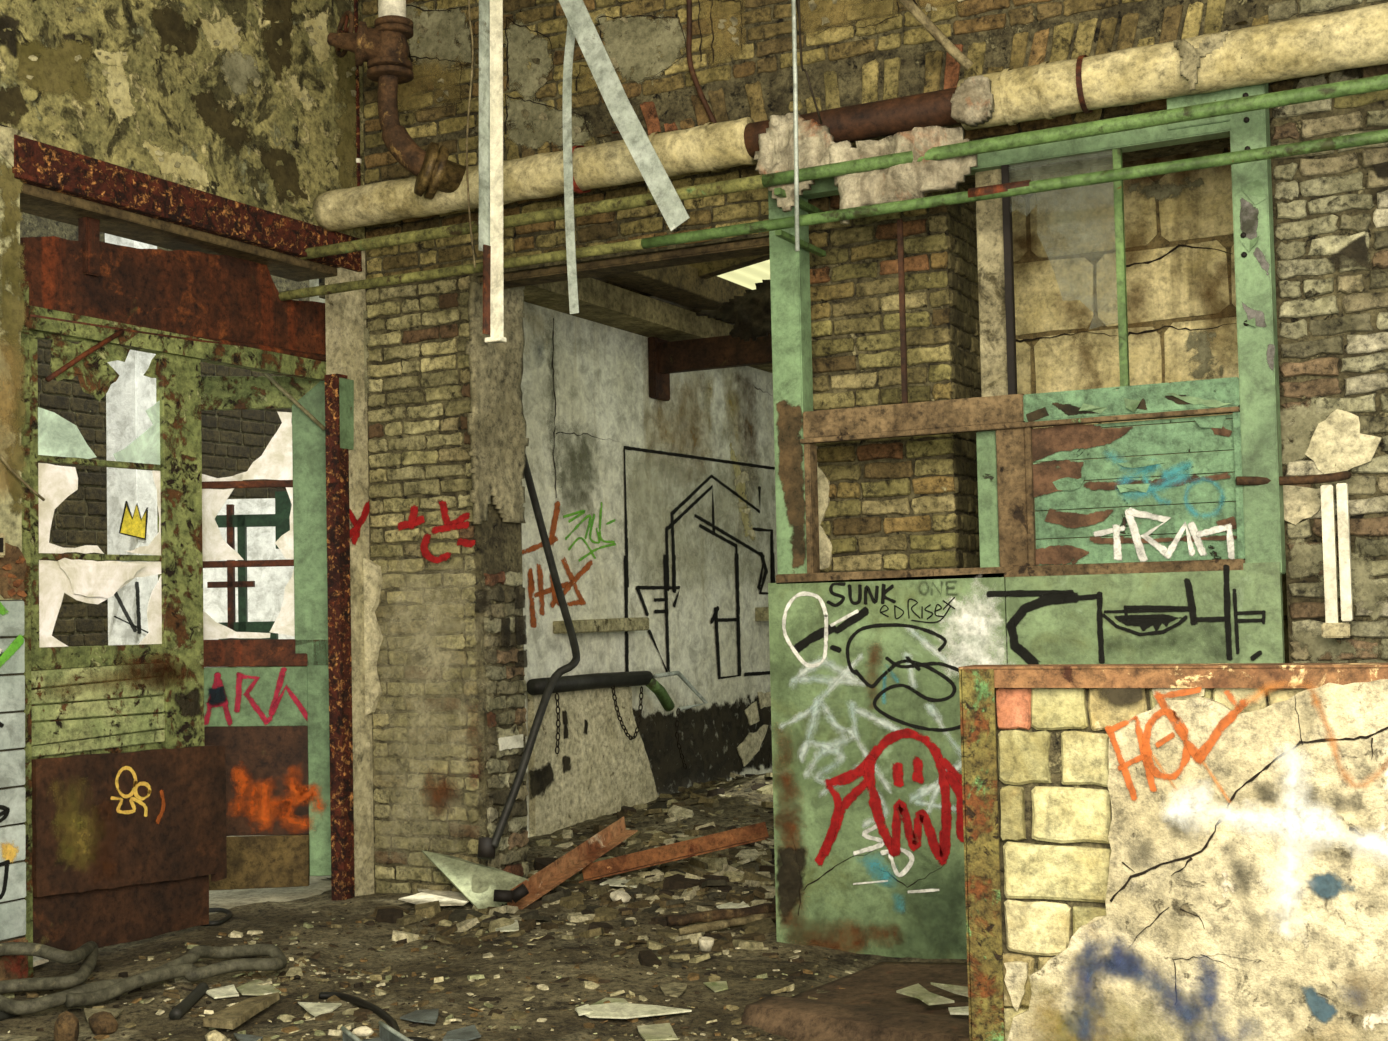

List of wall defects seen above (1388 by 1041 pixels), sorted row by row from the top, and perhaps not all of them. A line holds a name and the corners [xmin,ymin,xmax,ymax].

peeling [0,15,136,167]
peeling [142,0,360,204]
peeling [1026,393,1237,565]
flaking render [1100,688,1206,706]
peeling [1380,763,1388,840]
peeling [1222,862,1243,897]
crack [1110,698,1388,990]
flaking render [1004,961,1028,1012]
peeling [1363,1006,1388,1030]